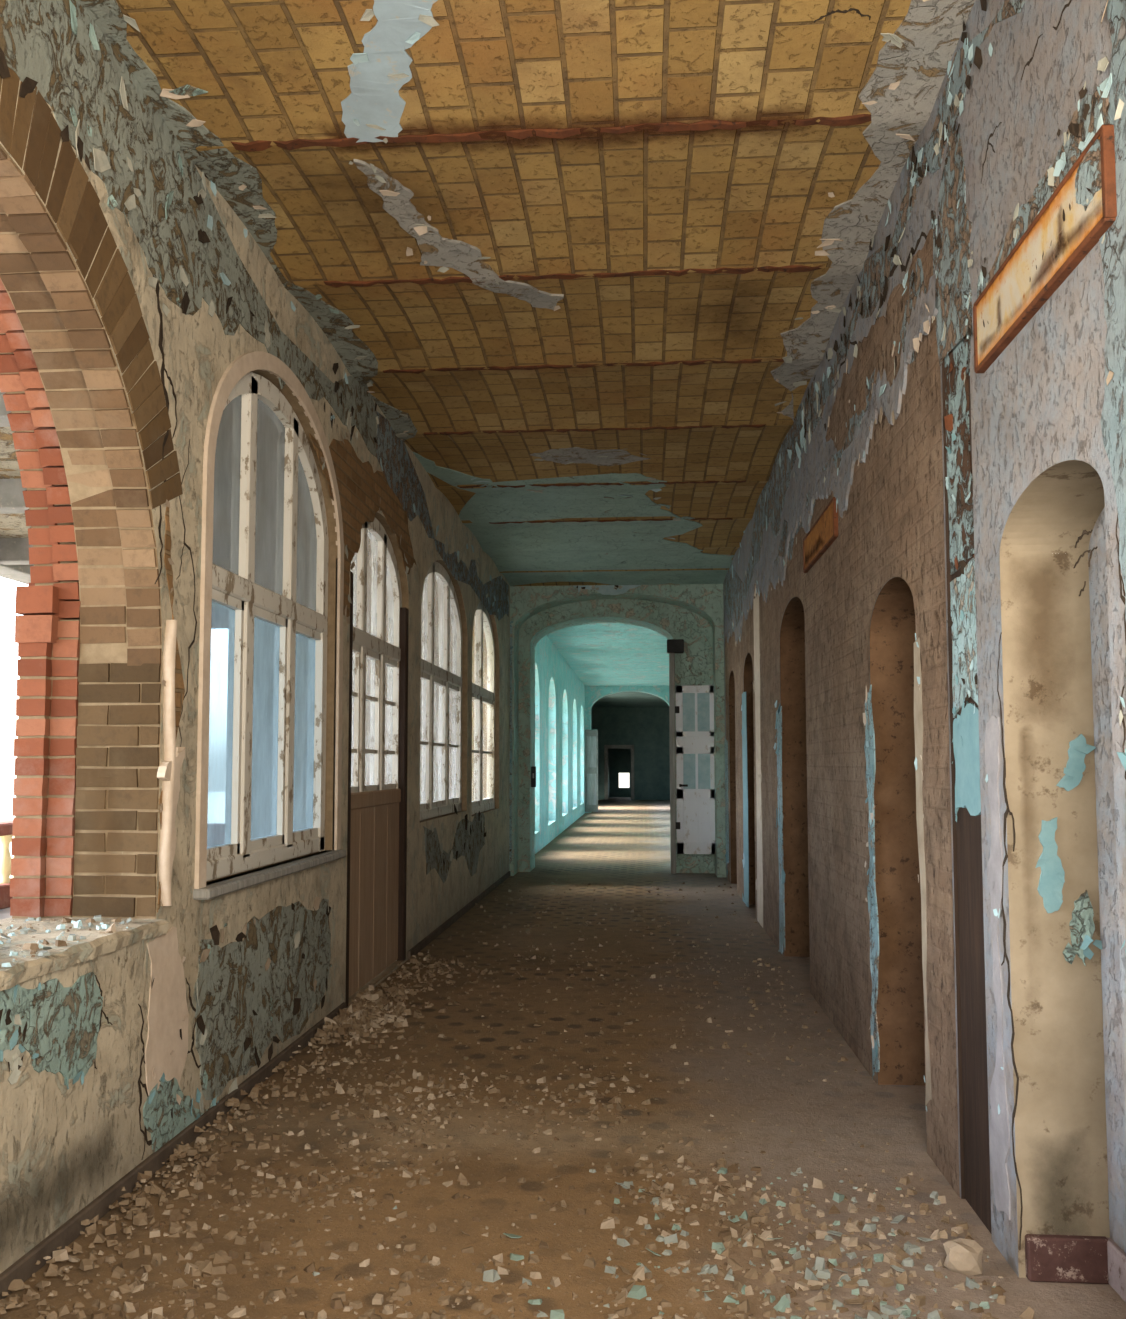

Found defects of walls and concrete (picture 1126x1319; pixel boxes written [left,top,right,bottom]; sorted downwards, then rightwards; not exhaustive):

flaking render [0,0,960,1198]
peeling [771,0,1026,822]
peeling [985,715,1011,1220]
peeling [977,0,1126,620]
peeling [1035,817,1102,966]
peeling [1056,734,1096,791]